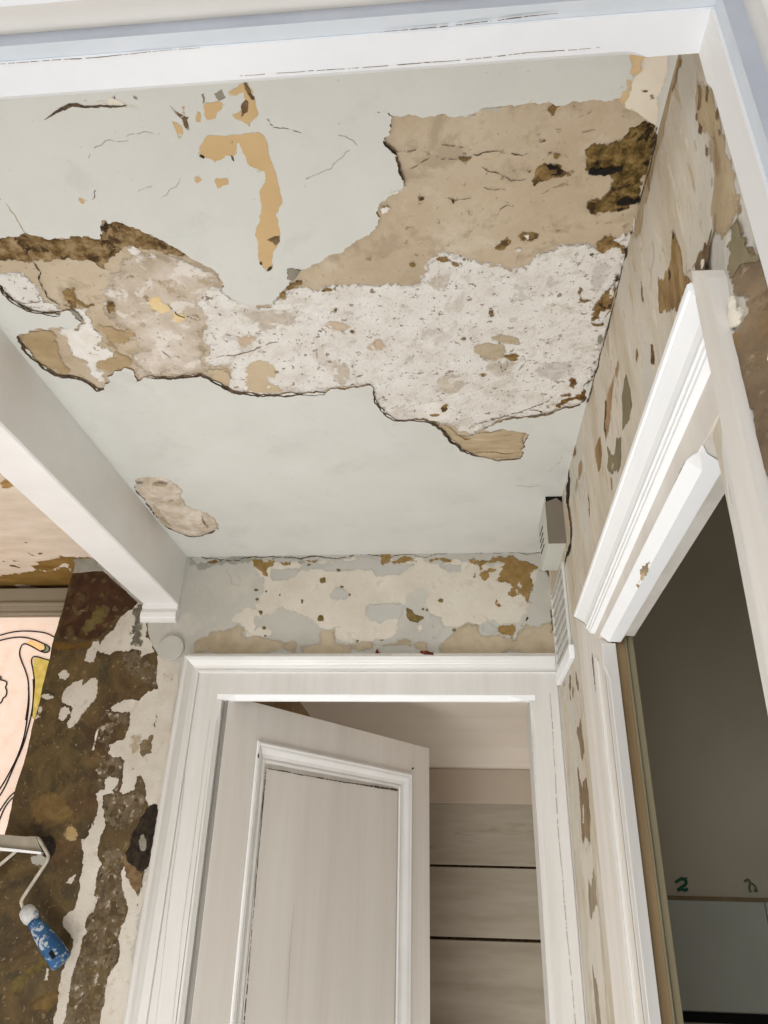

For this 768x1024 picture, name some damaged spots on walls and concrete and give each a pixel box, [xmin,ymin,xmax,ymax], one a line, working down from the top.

crack [44,96,149,158]
damp [590,55,682,257]
flaking render [0,55,669,474]
peeling [647,227,691,314]
flaking render [695,78,768,477]
peeling [0,474,93,589]
peeling [231,554,549,644]
peeling [636,561,650,588]
flaking render [31,603,180,1024]